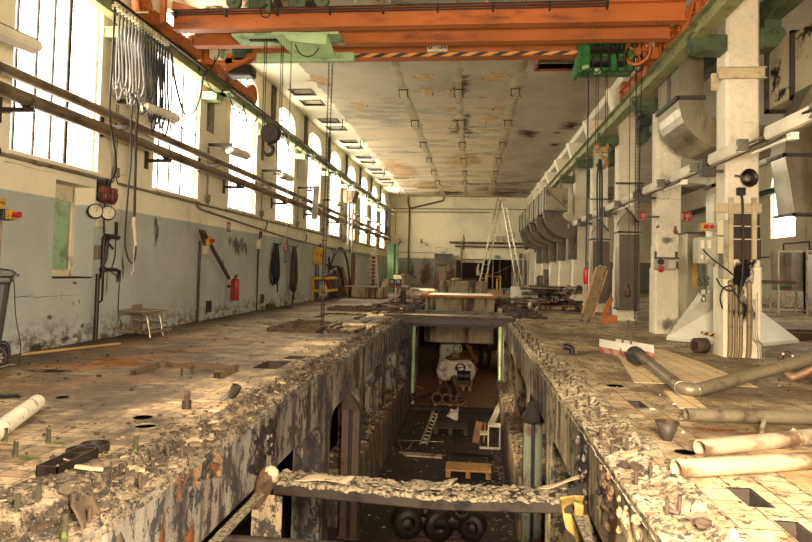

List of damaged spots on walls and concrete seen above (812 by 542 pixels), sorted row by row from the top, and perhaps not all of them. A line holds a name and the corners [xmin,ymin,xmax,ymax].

water stain [770,58,789,102]
water stain [732,259,757,322]
spalling [79,302,425,542]
spalling [497,325,663,542]